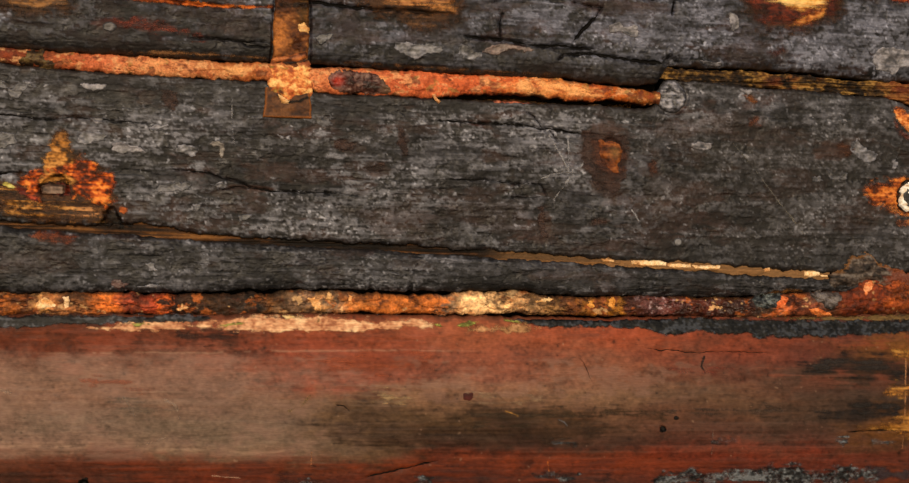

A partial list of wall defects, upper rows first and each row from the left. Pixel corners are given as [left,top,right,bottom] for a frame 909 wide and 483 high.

rust [0,47,273,82]
rust [309,67,660,107]
rust [894,107,909,139]
rust [592,132,627,174]
rust [0,128,127,244]
rust [864,177,909,225]
rust [0,252,909,319]